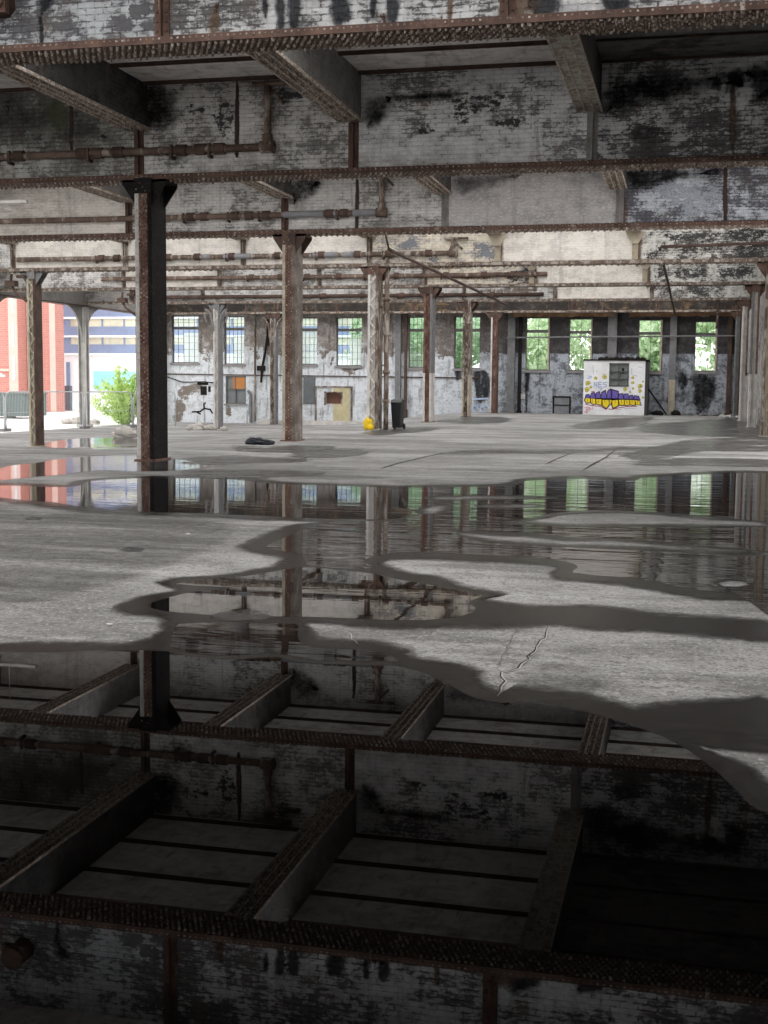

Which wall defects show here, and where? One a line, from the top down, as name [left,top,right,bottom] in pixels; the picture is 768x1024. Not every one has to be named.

damp [262,0,301,29]
damp [331,0,352,25]
damp [370,0,400,22]
spalling [174,383,202,422]
crack [495,623,550,696]